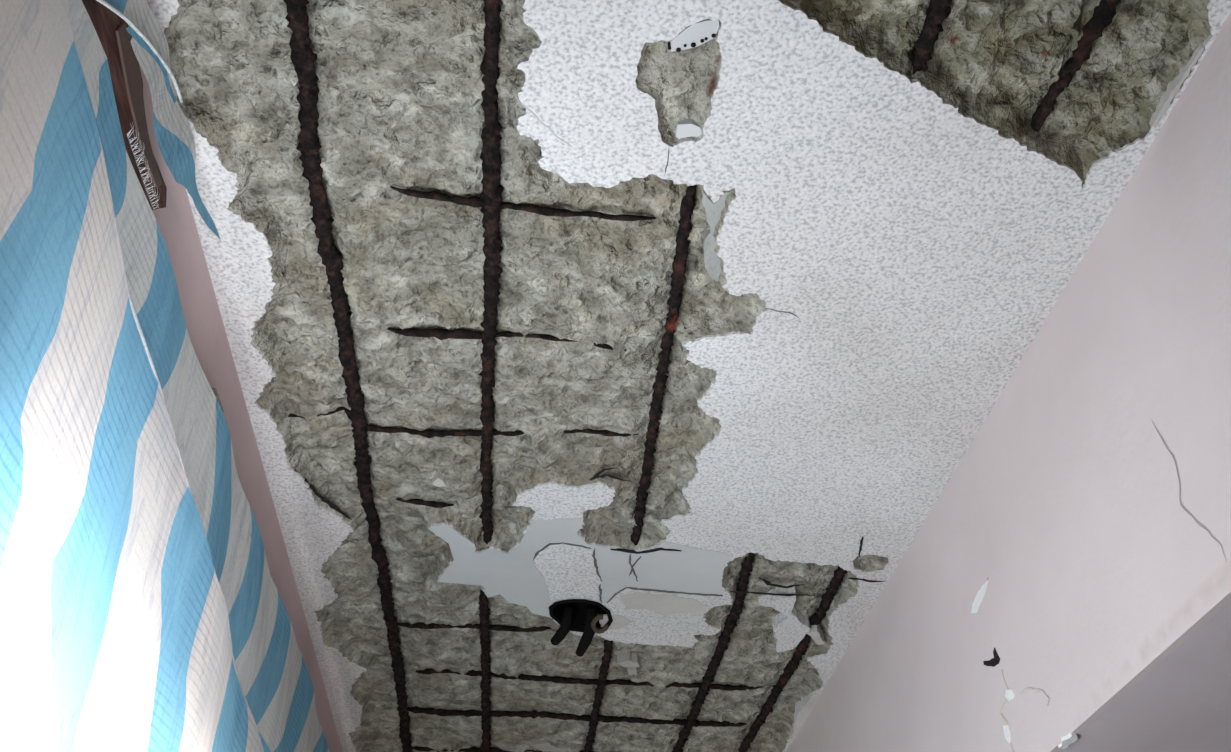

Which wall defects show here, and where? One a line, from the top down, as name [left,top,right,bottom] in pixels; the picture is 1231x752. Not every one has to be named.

spalling [781,0,1214,185]
spalling [164,0,888,752]
crack [1152,421,1226,560]